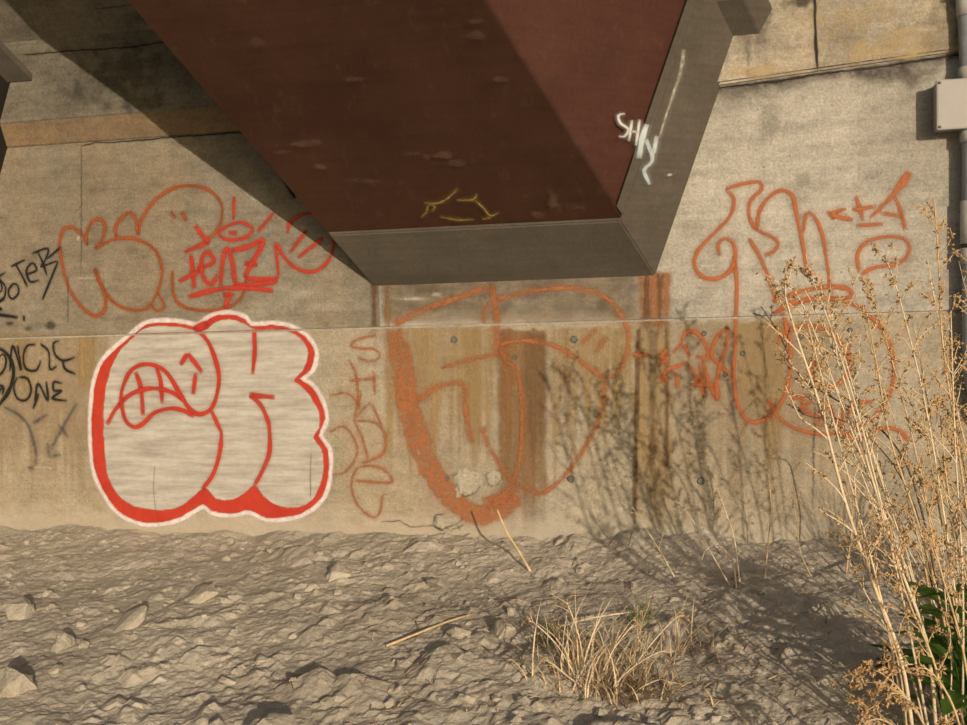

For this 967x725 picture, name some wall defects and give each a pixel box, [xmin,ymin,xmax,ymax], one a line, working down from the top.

corrosion [498,329,546,501]
corrosion [634,273,671,502]